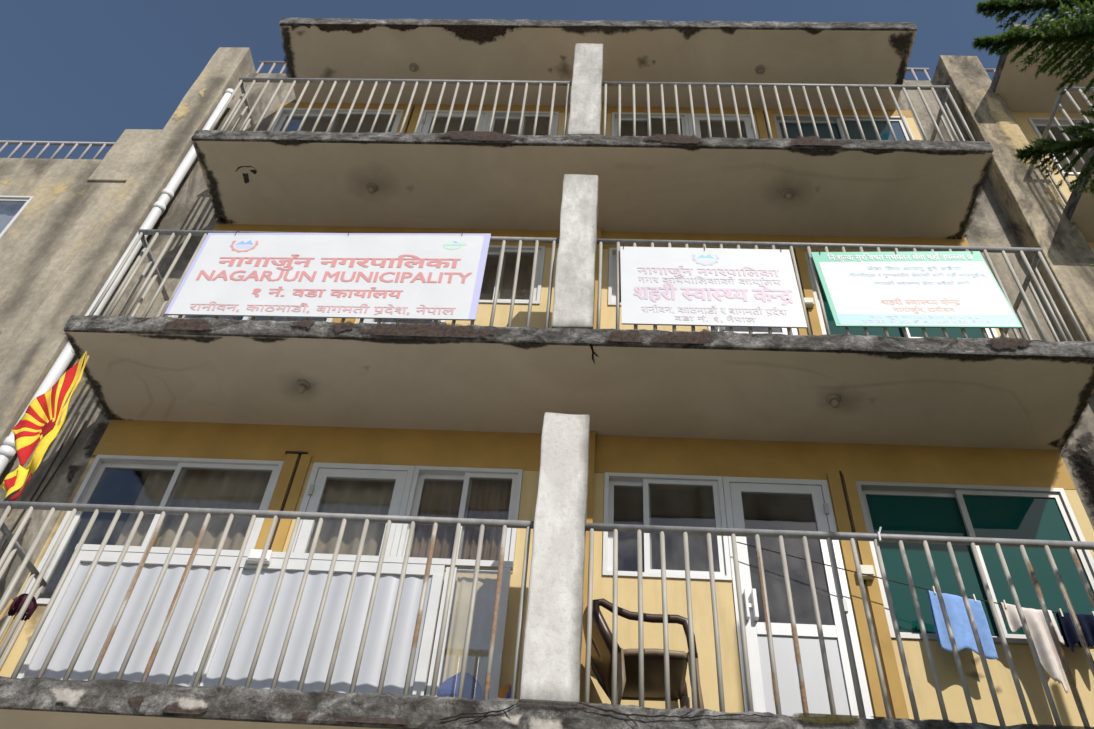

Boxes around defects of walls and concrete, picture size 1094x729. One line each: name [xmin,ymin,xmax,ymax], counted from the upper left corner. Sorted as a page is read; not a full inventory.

peeling [302,24,519,45]
peeling [889,33,913,85]
leakage [139,335,222,343]
leakage [65,333,131,482]
leakage [826,350,1094,514]
corrosion [168,531,202,615]
spalling [52,689,84,706]
spalling [128,695,145,711]
spalling [163,698,208,714]
crack [438,703,518,723]